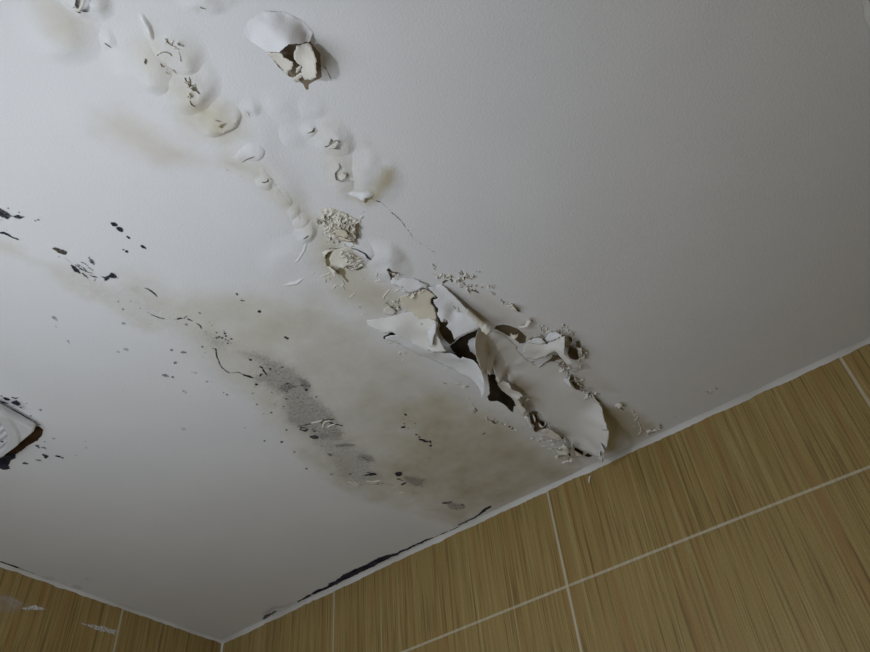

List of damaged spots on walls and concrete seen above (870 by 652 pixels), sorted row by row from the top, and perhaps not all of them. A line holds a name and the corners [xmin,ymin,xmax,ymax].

peeling [312,207,609,464]
damp [395,506,492,555]